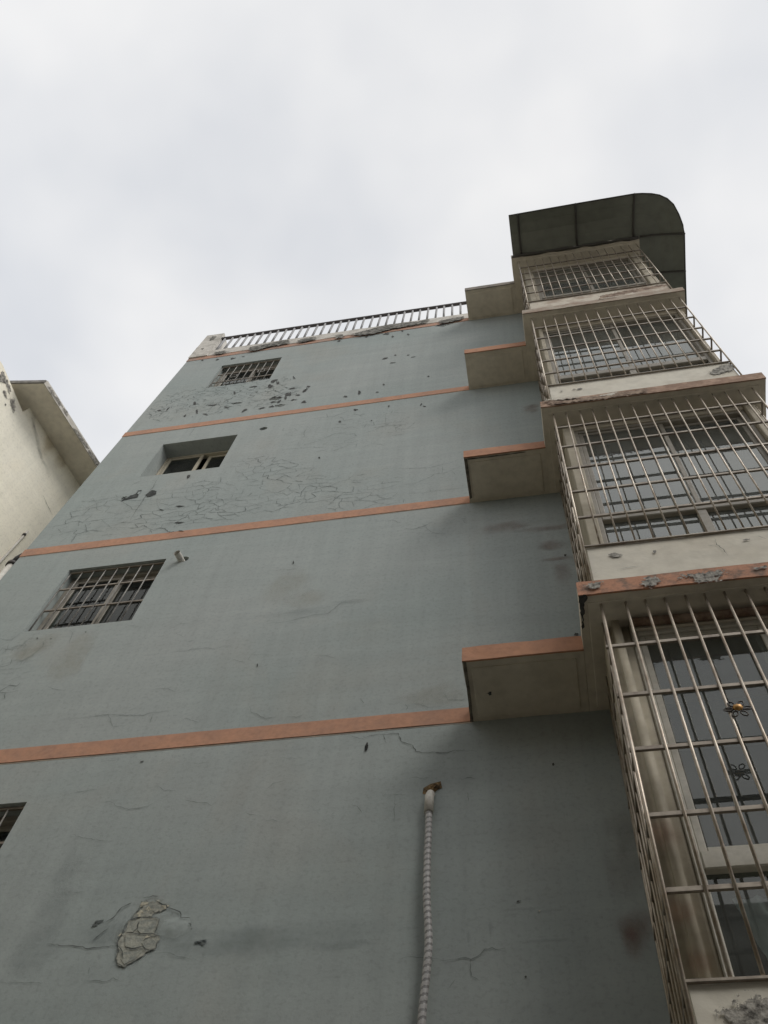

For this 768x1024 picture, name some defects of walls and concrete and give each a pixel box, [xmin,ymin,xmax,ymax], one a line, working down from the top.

peeling [184,376,310,417]
peeling [122,490,156,501]
crack [44,456,442,542]
peeling [677,569,728,585]
flaking render [92,895,191,967]